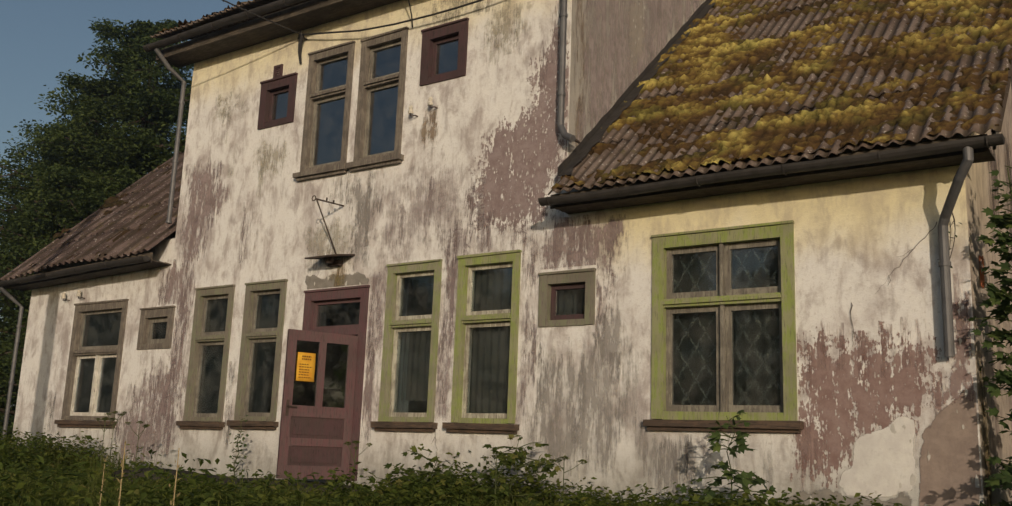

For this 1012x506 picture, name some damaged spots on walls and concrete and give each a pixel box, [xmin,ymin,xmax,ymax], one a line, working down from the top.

peeling [465,21,570,245]
leakage [576,0,699,144]
peeling [778,255,986,506]